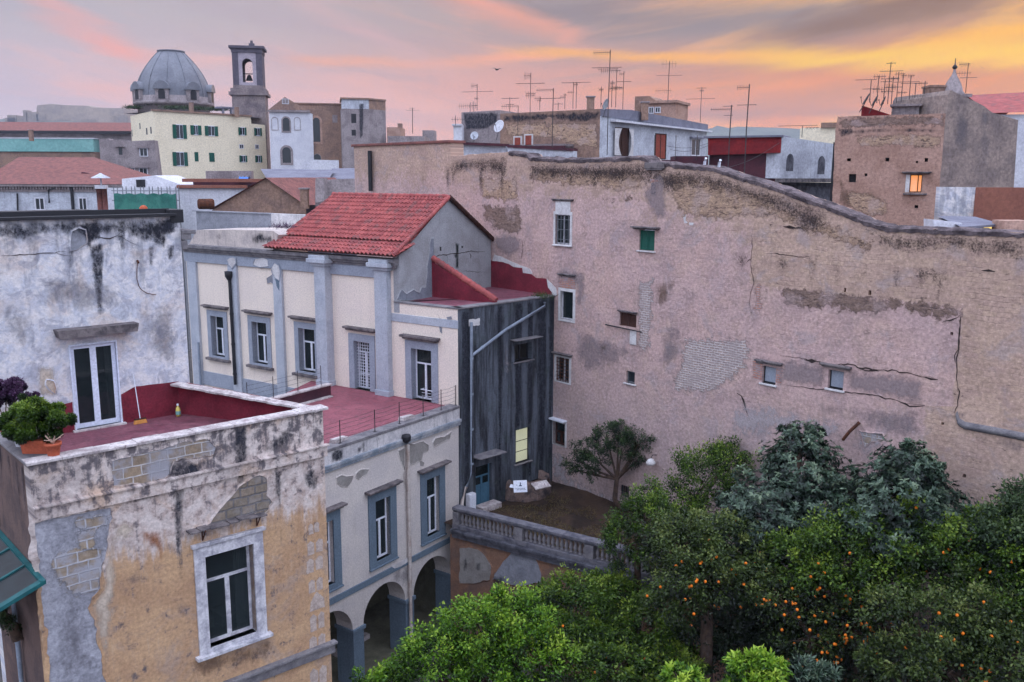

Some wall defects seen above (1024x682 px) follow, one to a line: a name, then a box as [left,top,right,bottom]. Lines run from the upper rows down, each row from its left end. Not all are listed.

damp [0,219,174,307]
crack [789,315,961,413]
damp [171,463,199,476]
flaking render [205,472,274,525]
damp [236,426,246,479]
flaking render [335,468,369,488]
flaking render [28,504,118,682]